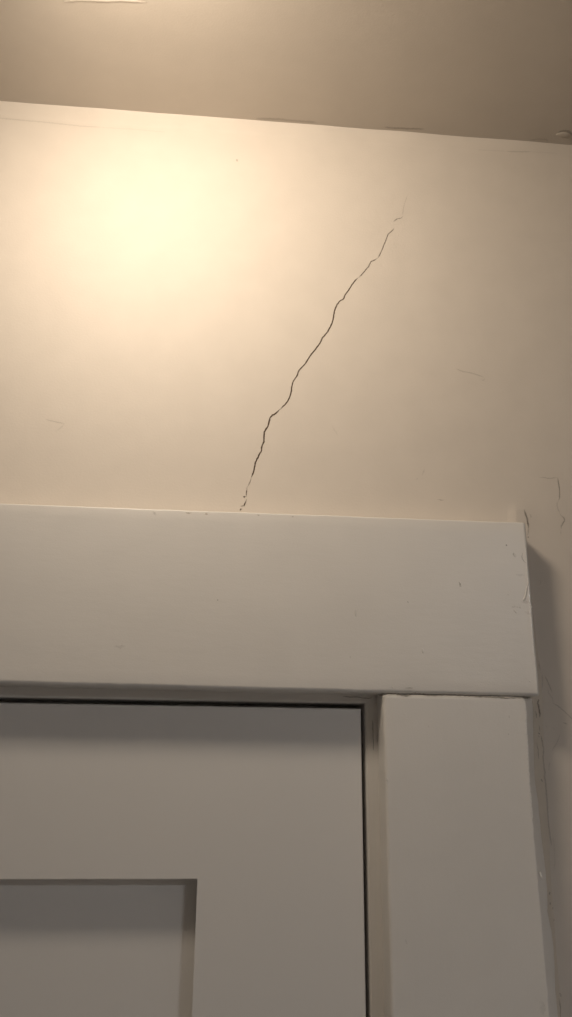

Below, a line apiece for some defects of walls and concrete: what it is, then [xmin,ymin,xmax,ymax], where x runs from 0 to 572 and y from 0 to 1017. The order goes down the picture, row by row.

crack [240,218,400,510]